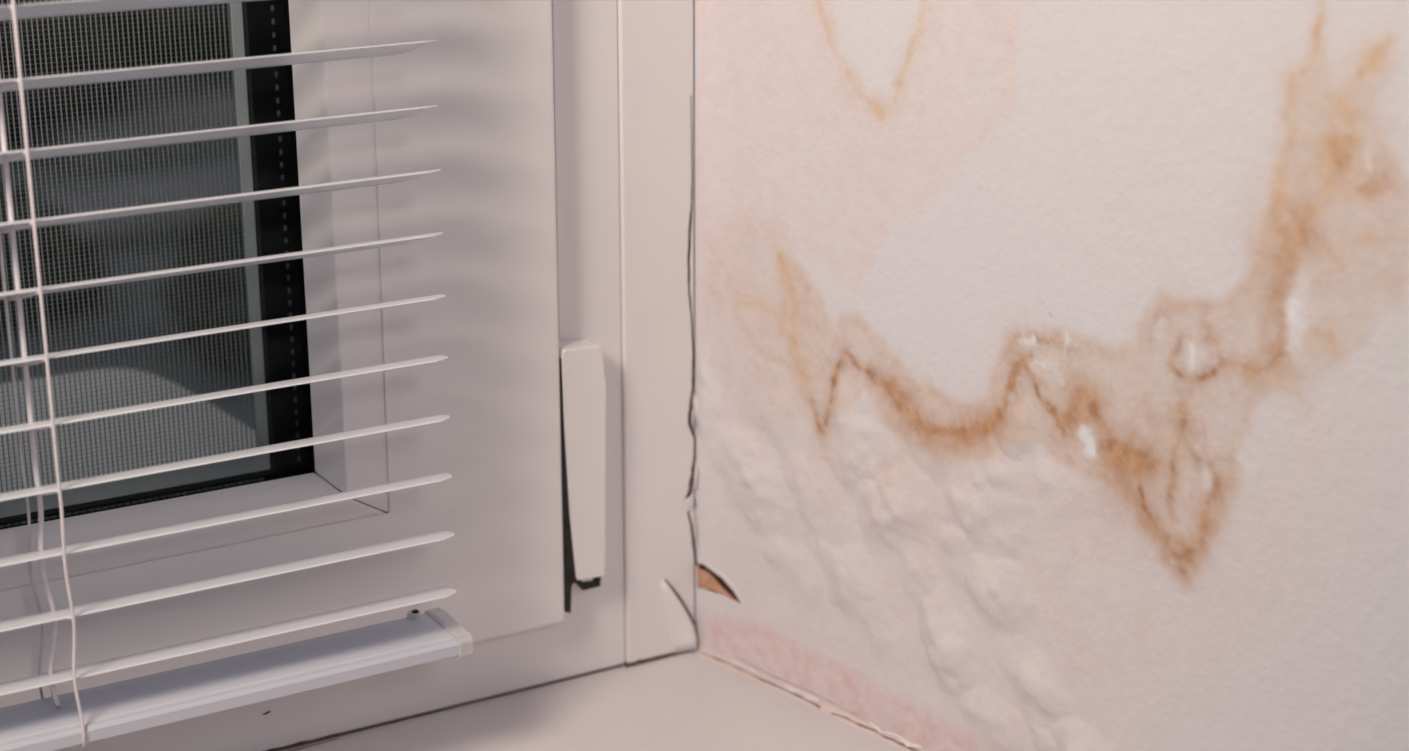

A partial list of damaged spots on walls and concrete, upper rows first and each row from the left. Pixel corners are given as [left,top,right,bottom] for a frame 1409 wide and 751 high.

flaking render [697,561,744,604]
leakage [695,0,1409,751]